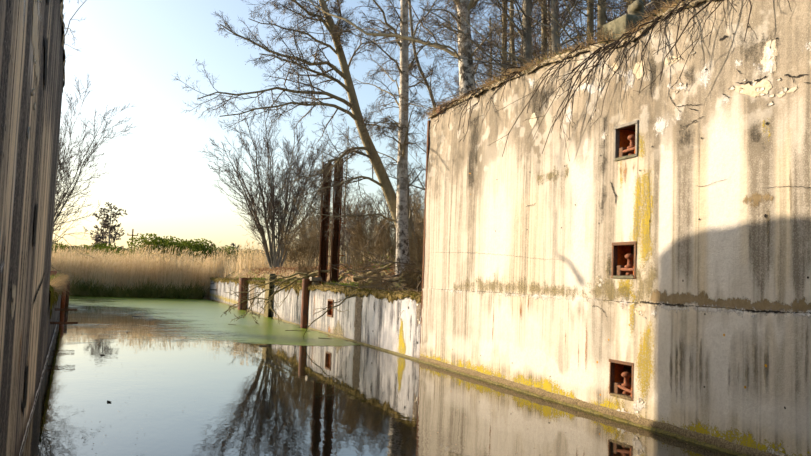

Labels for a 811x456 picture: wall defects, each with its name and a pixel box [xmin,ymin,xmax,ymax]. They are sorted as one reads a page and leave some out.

spalling [729,39,797,106]
leakage [654,113,680,136]
leakage [468,117,479,187]
leakage [743,193,773,245]
leakage [441,258,811,330]
crack [592,299,811,317]
leakage [670,344,701,394]